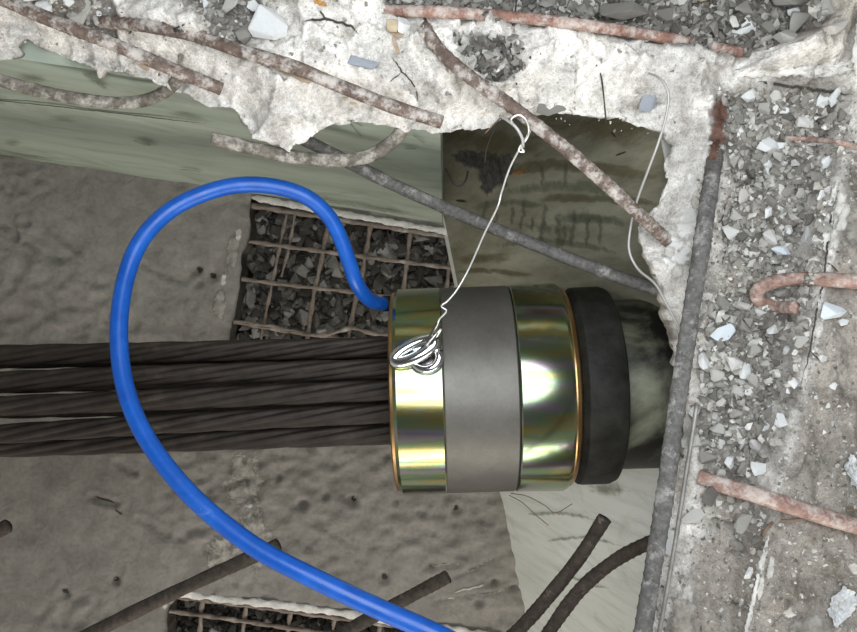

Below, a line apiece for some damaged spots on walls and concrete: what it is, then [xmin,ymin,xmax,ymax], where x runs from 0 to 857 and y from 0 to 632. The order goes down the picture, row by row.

spalling [197,203,388,339]
spalling [0,0,658,296]
spalling [383,4,857,632]
rust [708,95,730,160]